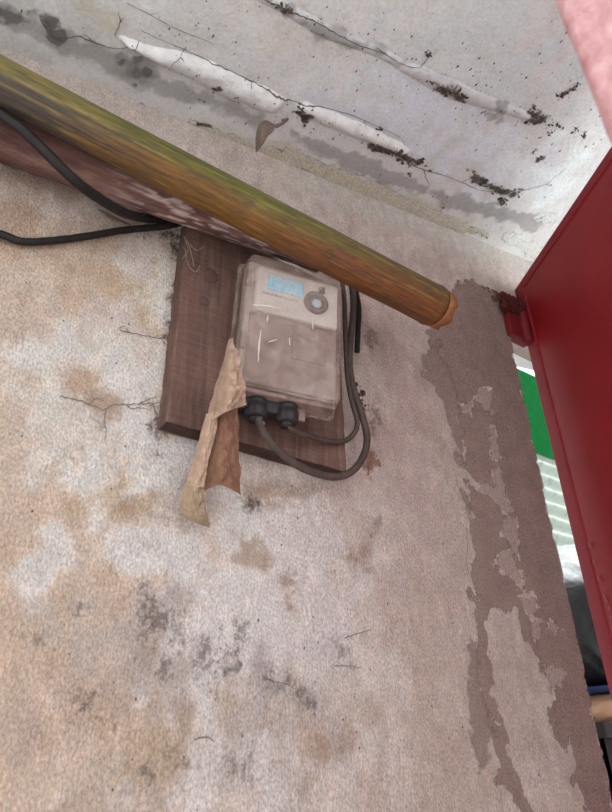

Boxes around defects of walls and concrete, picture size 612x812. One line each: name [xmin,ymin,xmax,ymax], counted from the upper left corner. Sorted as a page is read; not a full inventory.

leakage [118,56,152,87]
crack [39,0,498,193]
crack [60,395,160,441]
peeling [479,428,527,583]